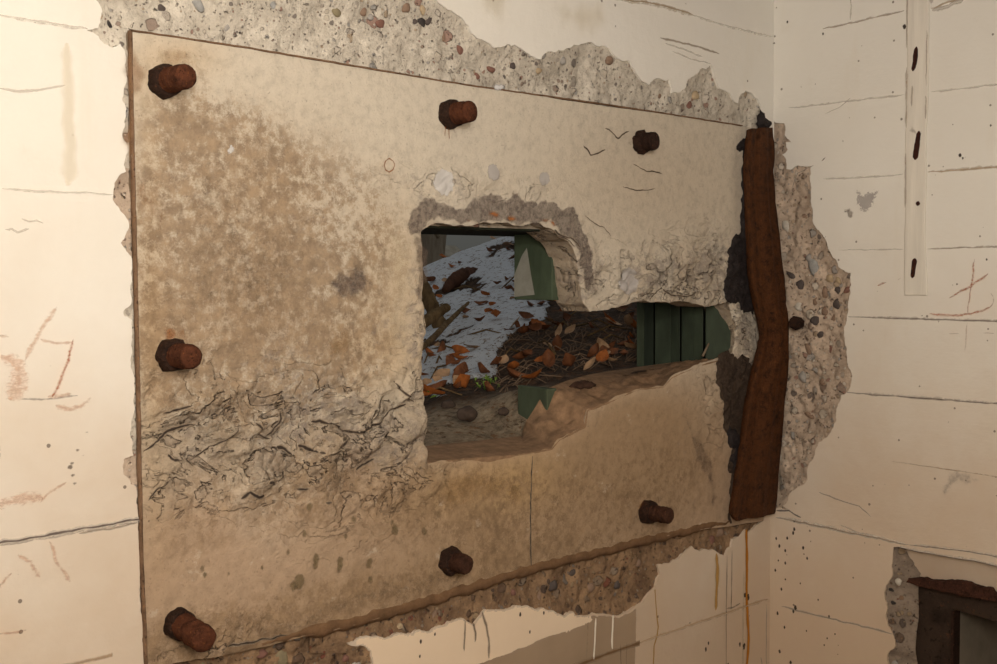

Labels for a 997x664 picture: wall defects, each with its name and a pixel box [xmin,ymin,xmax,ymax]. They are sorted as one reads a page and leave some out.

spalling [87,0,760,504]
spalling [774,122,852,510]
crack [0,381,414,545]
spalling [173,522,758,664]
spalling [886,547,997,664]